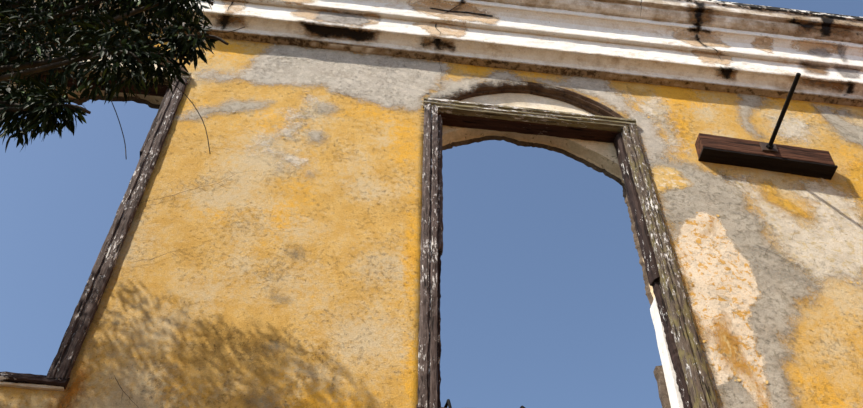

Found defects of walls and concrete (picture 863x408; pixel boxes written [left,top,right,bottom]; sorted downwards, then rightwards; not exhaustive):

leakage [301,22,376,41]
leakage [687,2,713,46]
leakage [790,17,861,94]
peeling [630,97,689,153]
peeling [775,117,810,141]
peeling [731,177,863,287]
flaking render [675,212,773,408]